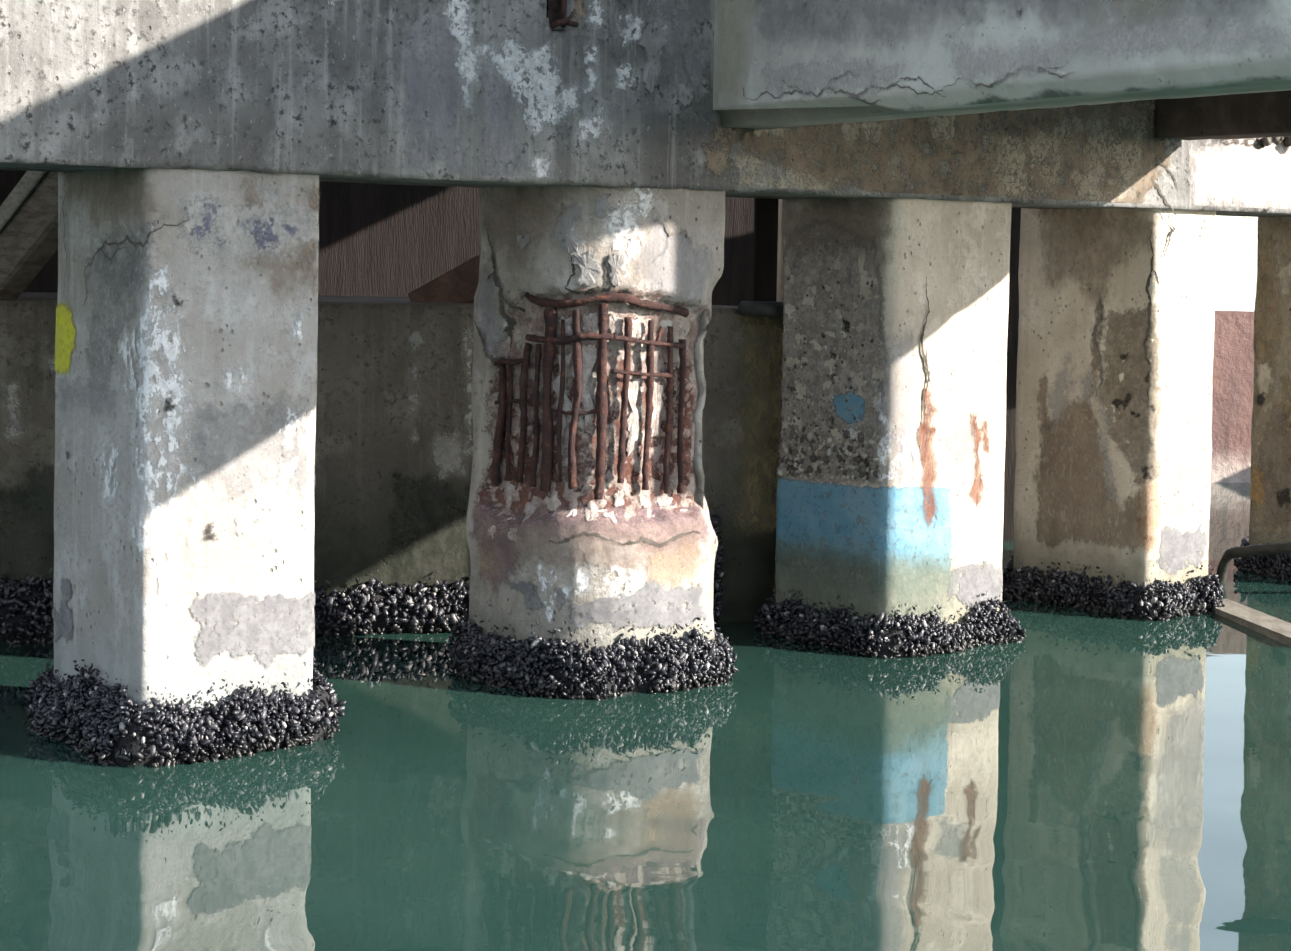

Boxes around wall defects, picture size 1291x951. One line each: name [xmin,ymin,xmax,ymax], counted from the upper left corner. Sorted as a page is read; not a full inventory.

crack [742,61,1070,105]
crack [474,228,529,400]
crack [565,256,622,295]
spalling [477,193,711,542]
crack [652,218,693,264]
spalling [777,218,888,484]
crack [920,277,932,426]
crack [1135,163,1179,403]
rust [919,389,938,526]
rust [969,416,989,507]